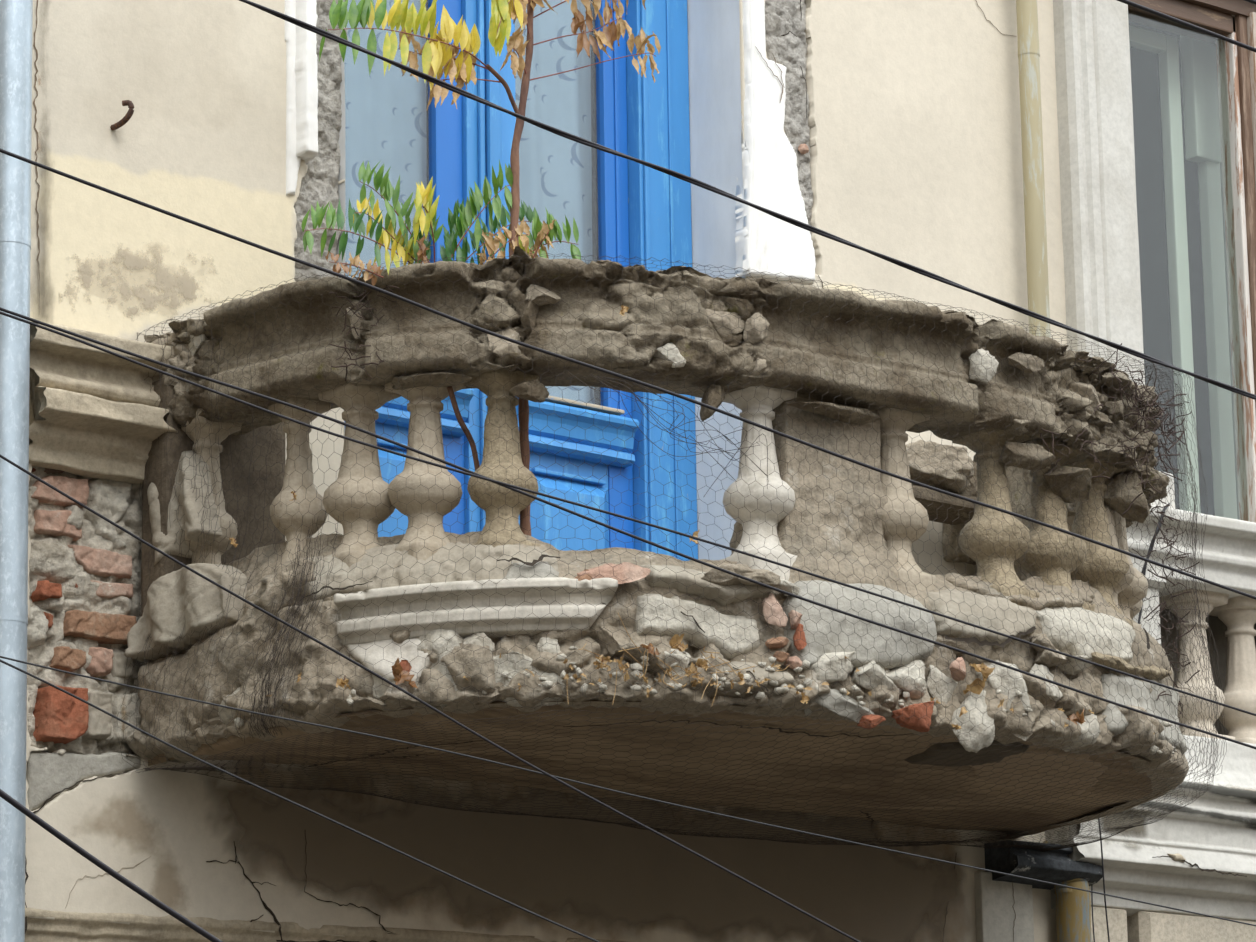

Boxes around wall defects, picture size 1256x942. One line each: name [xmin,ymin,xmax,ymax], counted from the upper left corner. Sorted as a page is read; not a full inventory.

spalling [765,0,813,236]
leakage [78,249,198,316]
spalling [525,284,561,306]
spalling [487,329,521,357]
spalling [654,343,686,368]
spalling [704,308,770,376]
spalling [969,349,1045,384]
spalling [906,440,978,497]
spalling [998,419,1151,523]
flaking render [26,466,146,811]
spalling [417,562,1130,767]
crack [206,835,398,942]